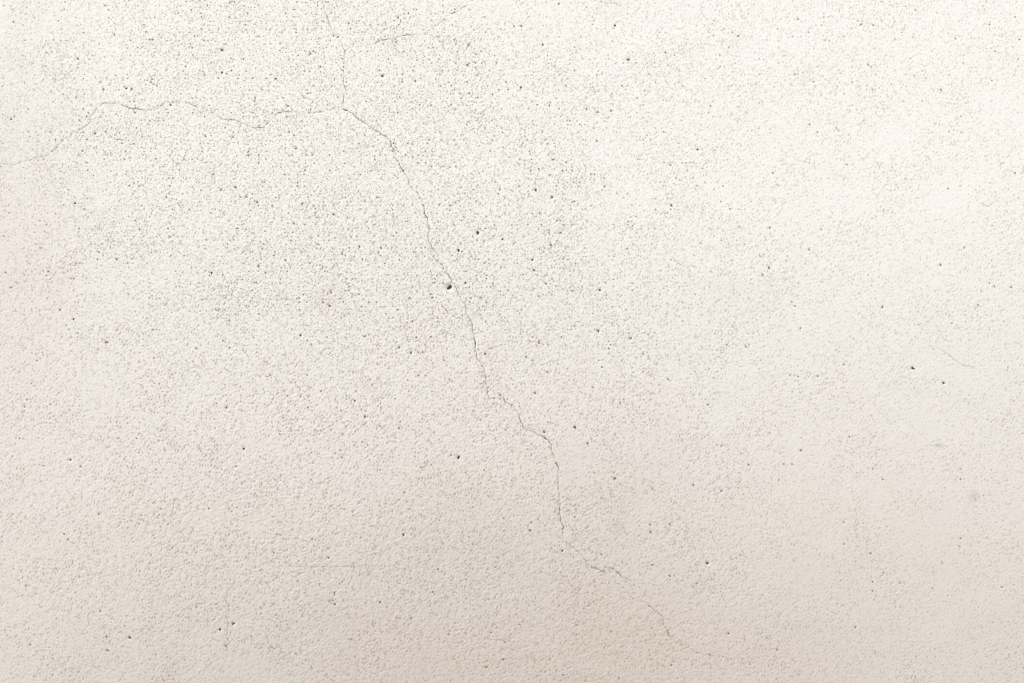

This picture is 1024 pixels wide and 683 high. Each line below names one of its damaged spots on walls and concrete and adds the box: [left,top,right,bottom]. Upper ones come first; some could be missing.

crack [321,0,732,660]